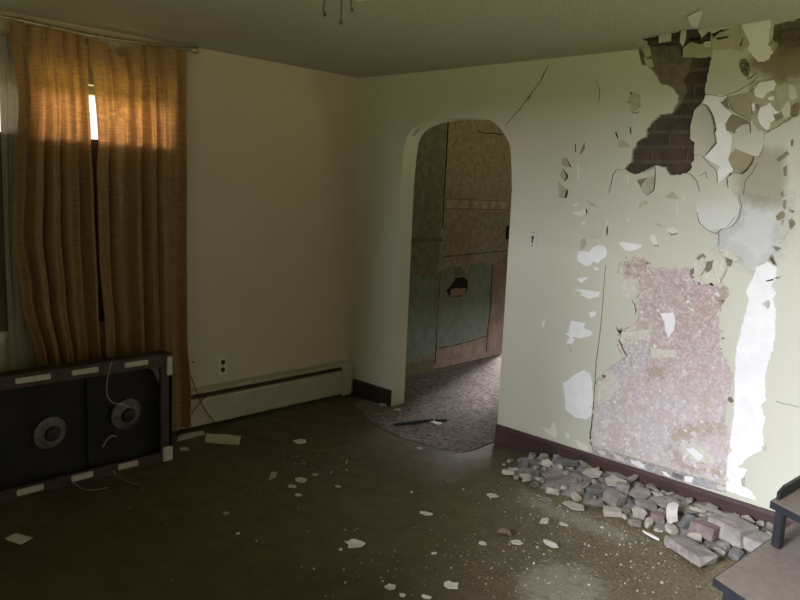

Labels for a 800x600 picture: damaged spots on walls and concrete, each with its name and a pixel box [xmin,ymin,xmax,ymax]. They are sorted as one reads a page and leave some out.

crack [478,65,549,135]
peeling [558,142,598,225]
flaking render [615,10,800,209]
peeling [406,248,508,367]
crack [589,267,628,446]
flaking render [542,190,795,500]